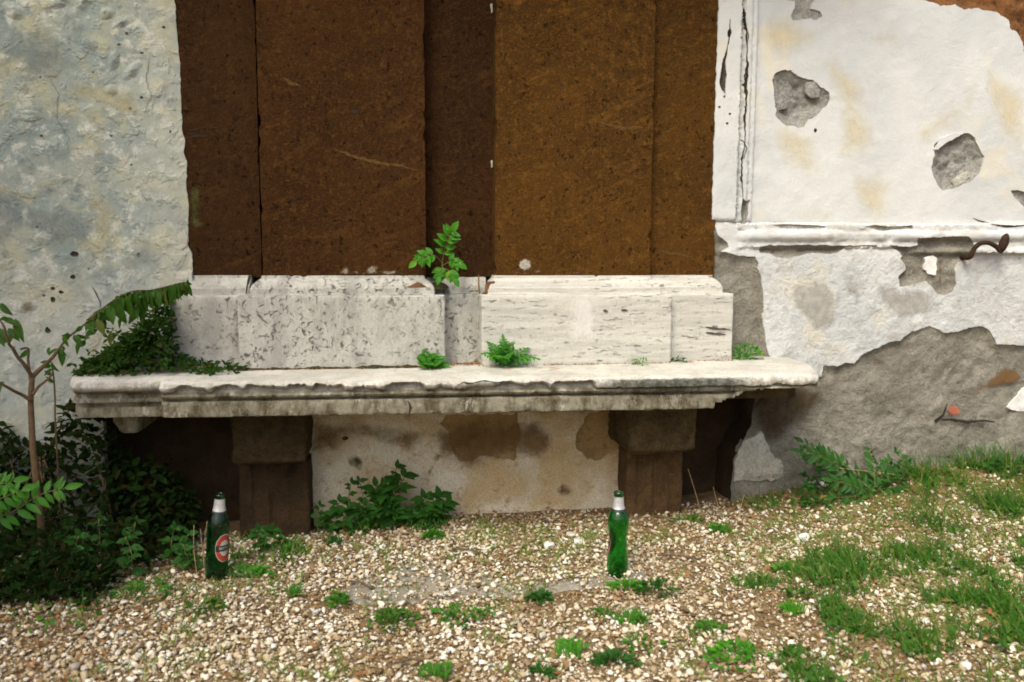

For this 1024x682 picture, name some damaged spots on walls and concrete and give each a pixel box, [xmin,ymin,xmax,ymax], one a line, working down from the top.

flaking render [791,0,822,20]
flaking render [926,0,1024,46]
crack [719,4,749,195]
flaking render [772,70,830,133]
flaking render [931,133,983,191]
flaking render [865,225,976,295]
corrosion [975,368,1019,392]
flaking render [731,326,1024,501]